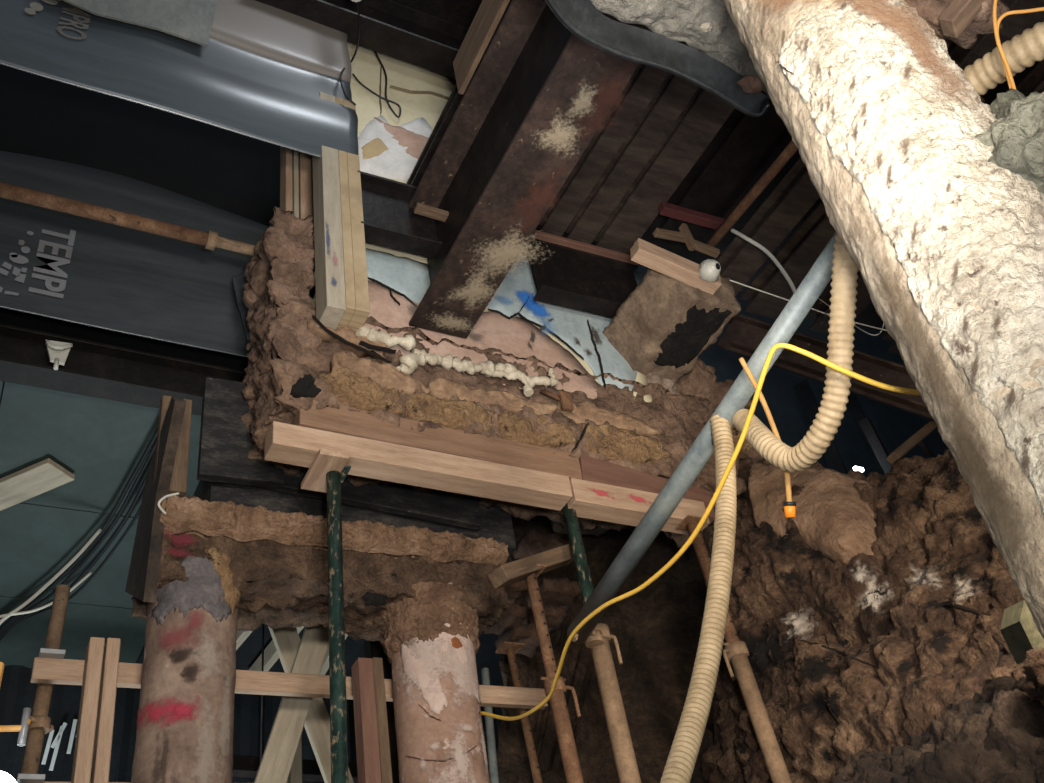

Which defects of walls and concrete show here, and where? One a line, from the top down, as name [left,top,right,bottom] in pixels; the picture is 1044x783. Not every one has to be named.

spalling [241,243,714,479]
spalling [346,474,461,495]
spalling [691,452,716,508]
spalling [734,448,747,497]
spalling [160,495,327,615]
spalling [342,497,632,565]
spalling [664,525,710,548]
crack [408,745,478,762]
flaking render [429,723,487,783]